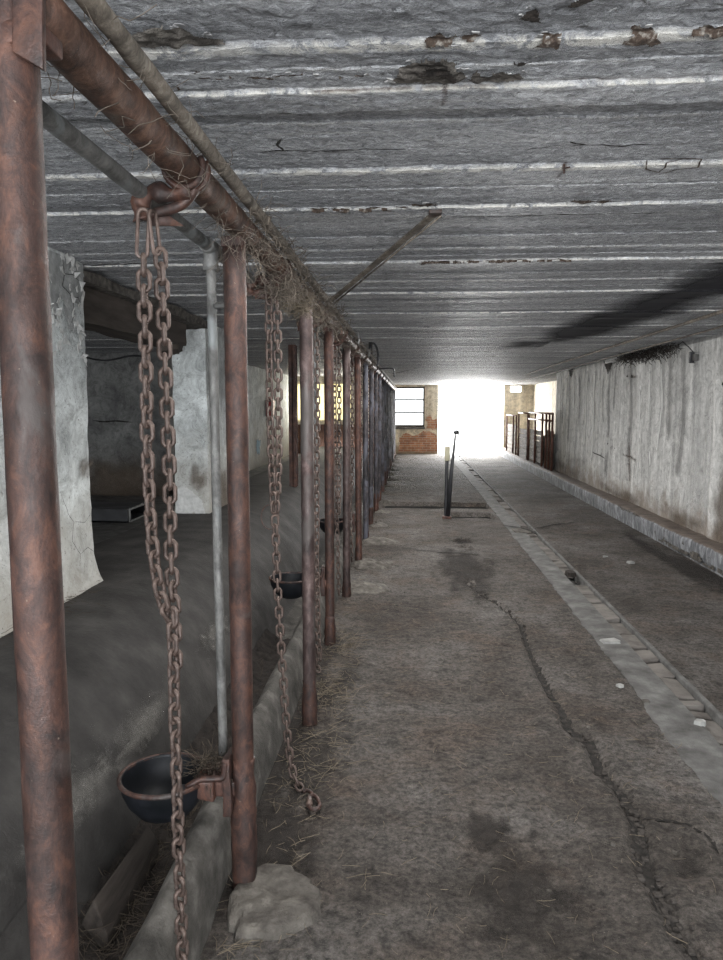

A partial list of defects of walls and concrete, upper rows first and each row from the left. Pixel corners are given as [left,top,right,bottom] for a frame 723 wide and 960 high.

spalling [132,23,225,49]
peeling [518,5,562,50]
peeling [622,24,661,47]
peeling [691,25,723,39]
spalling [385,31,531,85]
crack [531,141,703,173]
peeling [48,250,88,365]
flaking render [399,415,438,453]
crack [402,547,719,960]